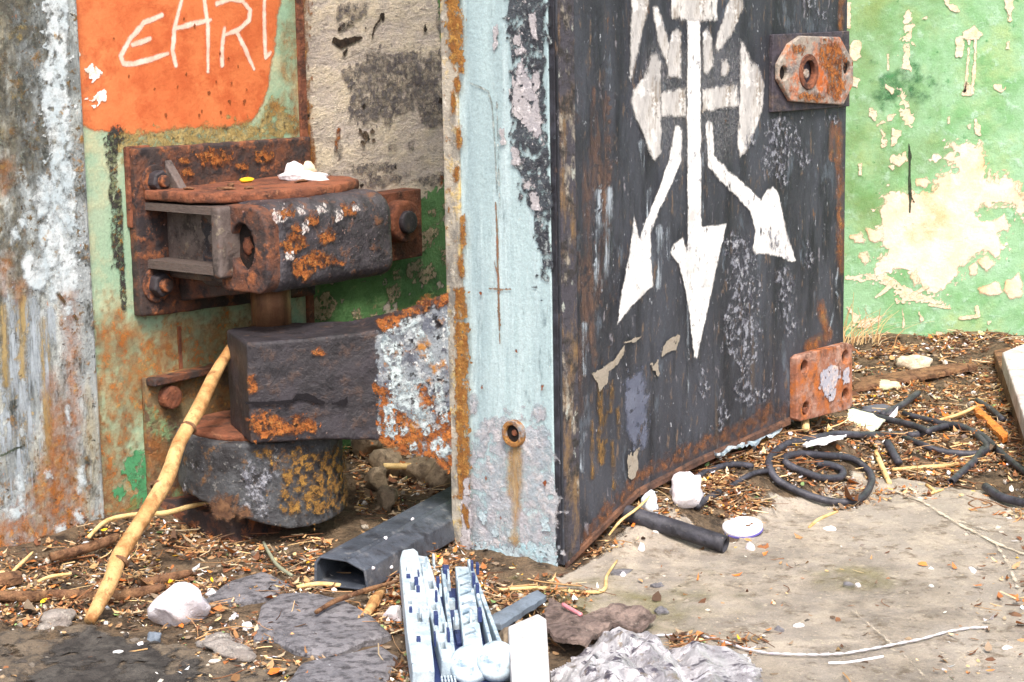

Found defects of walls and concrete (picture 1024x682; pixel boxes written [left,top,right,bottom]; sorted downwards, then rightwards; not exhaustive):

rust [444,0,467,113]
peeling [492,0,558,288]
rust [793,39,848,103]
peeling [847,2,862,61]
peeling [869,84,915,170]
rust [279,204,344,280]
peeling [849,119,1024,322]
rust [96,303,252,515]
peeling [580,337,640,391]
peeling [621,334,680,479]
rust [203,493,252,522]
rust [245,410,348,522]